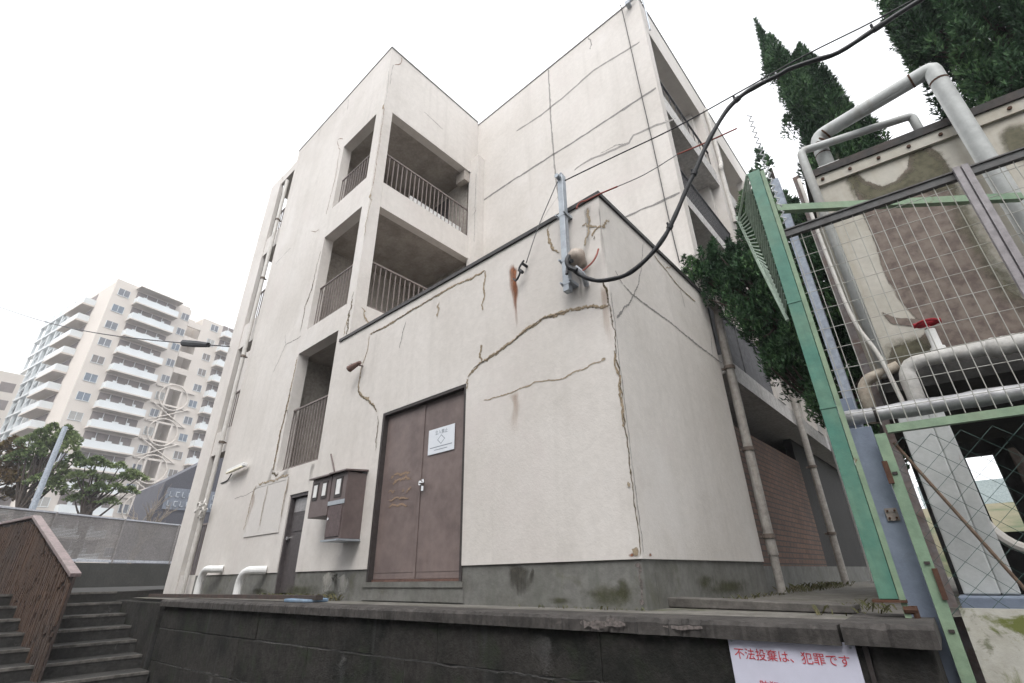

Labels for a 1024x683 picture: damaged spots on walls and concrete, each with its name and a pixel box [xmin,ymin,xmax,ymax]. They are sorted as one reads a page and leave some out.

crack [474,37,679,253]
crack [235,132,343,499]
crack [344,270,486,450]
crack [466,247,722,556]
water stain [511,566,534,589]
spalling [580,618,625,630]